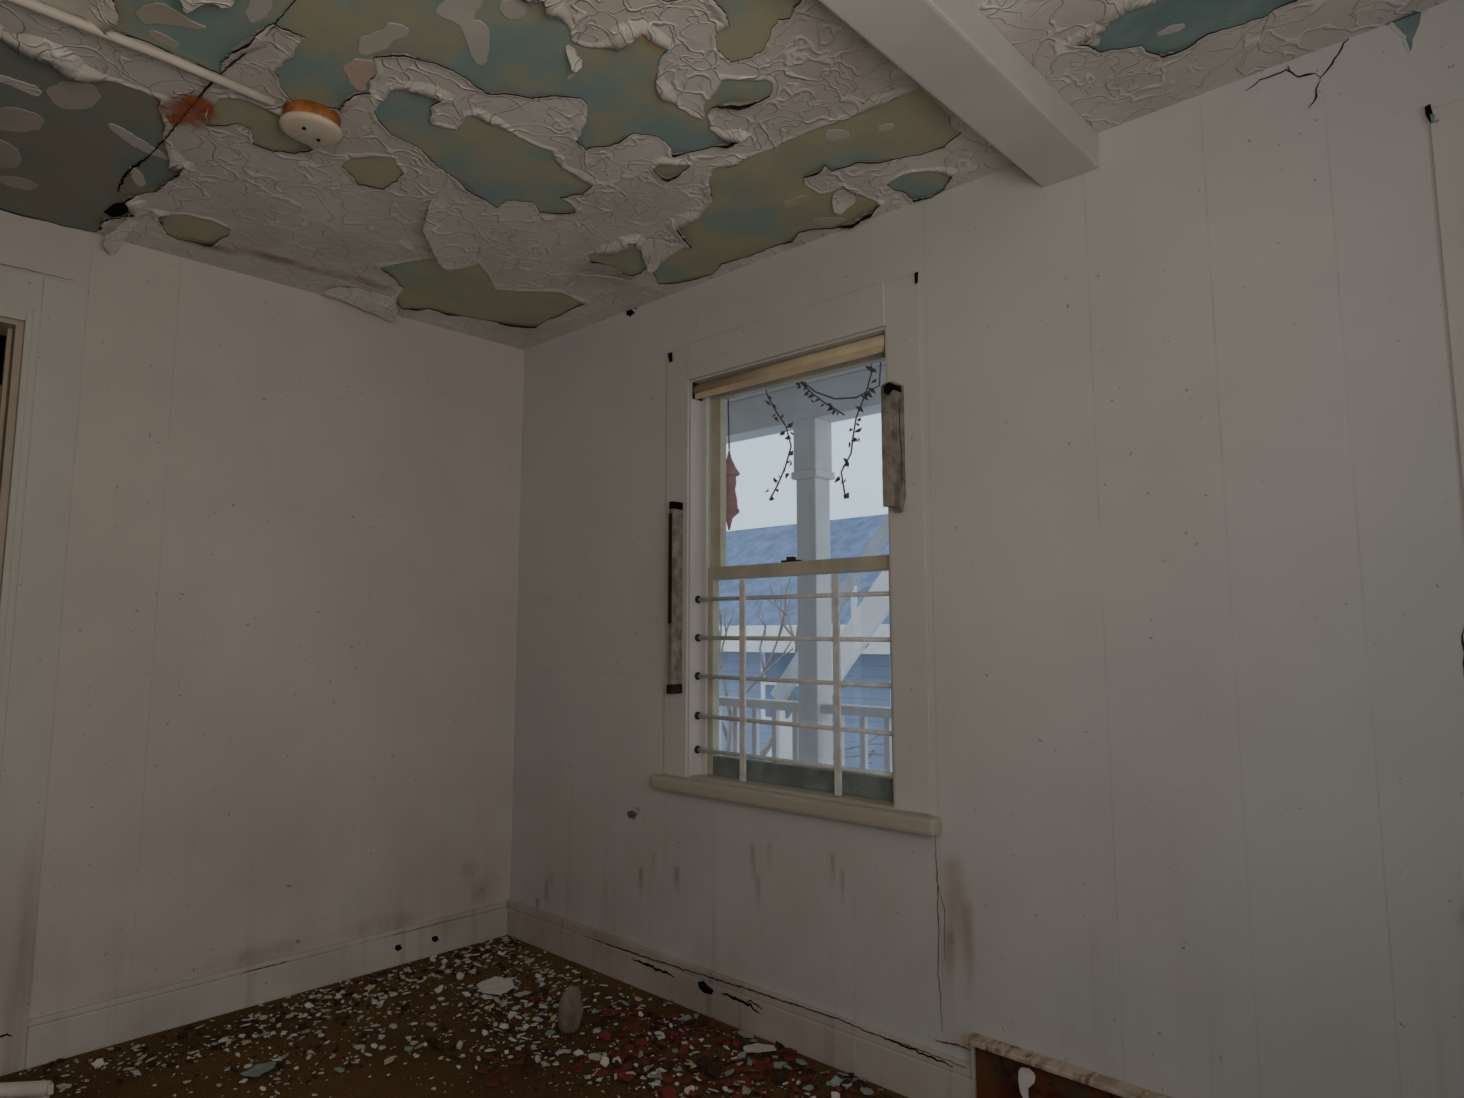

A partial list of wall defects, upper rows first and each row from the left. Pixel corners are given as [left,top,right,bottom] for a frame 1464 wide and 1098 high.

peeling [1063,0,1304,62]
peeling [1385,10,1426,56]
crack [1245,38,1349,108]
peeling [0,24,234,255]
peeling [83,0,967,328]
crack [1456,629,1464,673]
corrosion [1003,1080,1023,1098]